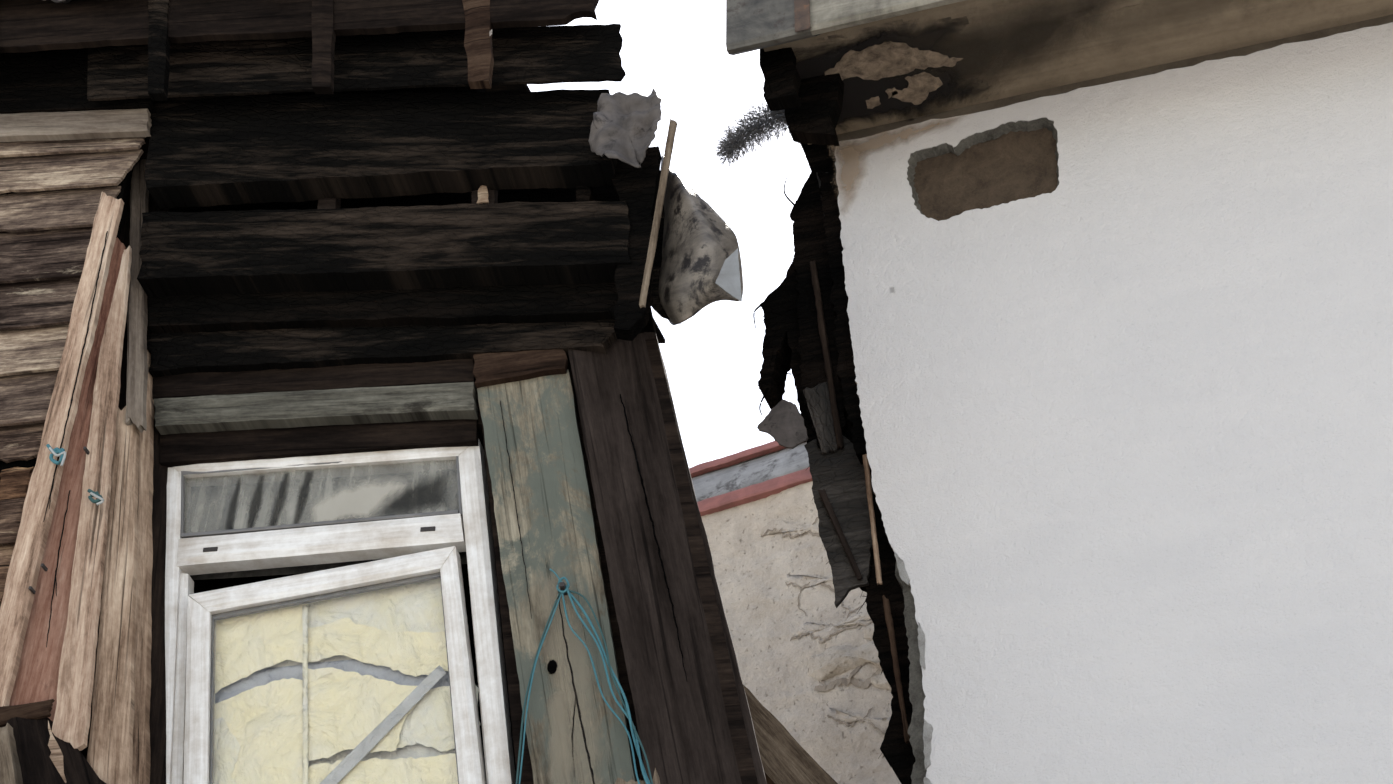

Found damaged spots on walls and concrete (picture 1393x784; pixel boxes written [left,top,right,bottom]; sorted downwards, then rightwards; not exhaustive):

peeling [825,41,963,109]
spalling [907,118,1059,221]
spalling [818,171,870,467]
crack [761,517,820,539]
crack [785,582,885,735]
spalling [893,550,933,784]